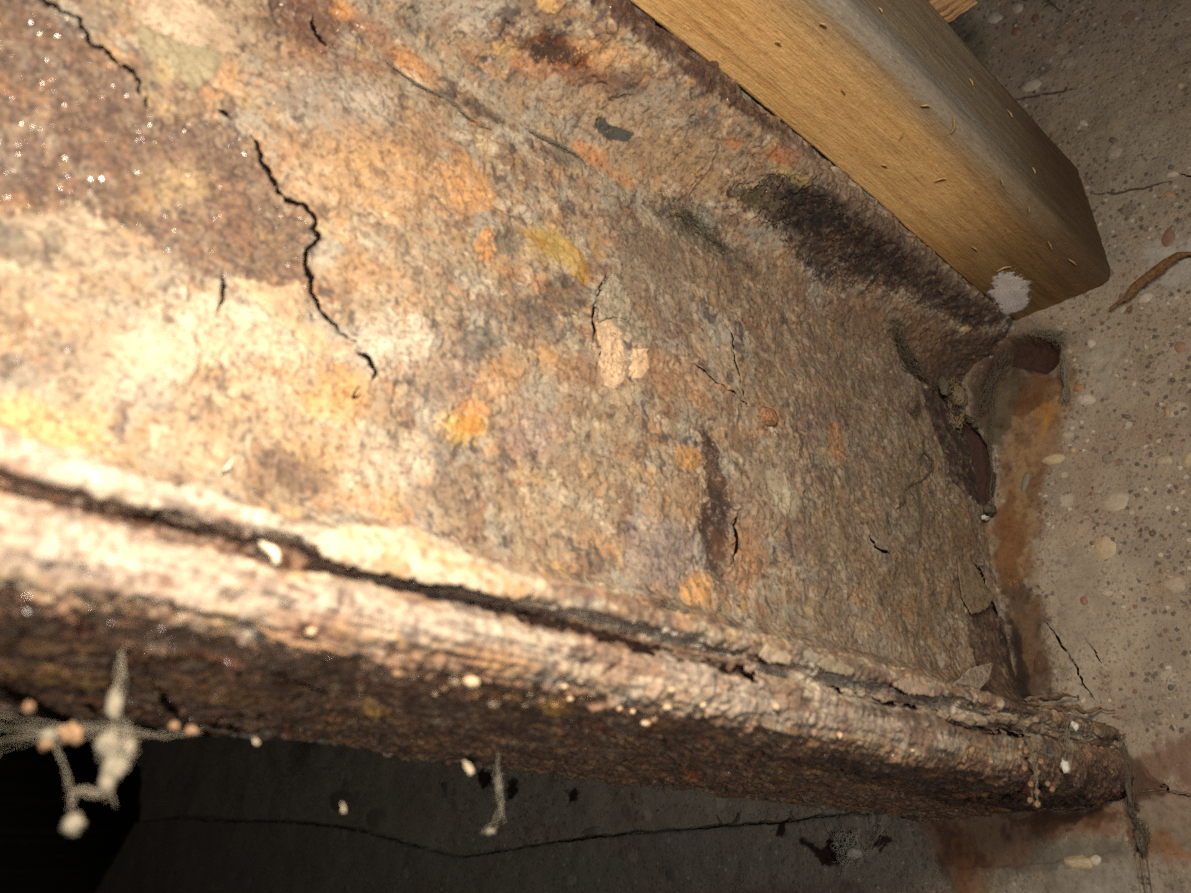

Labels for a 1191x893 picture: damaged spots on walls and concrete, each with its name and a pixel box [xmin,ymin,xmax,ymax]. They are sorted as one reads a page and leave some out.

crack [43,0,148,108]
crack [310,16,328,46]
crack [217,109,377,399]
rust [521,228,632,323]
rust [0,486,758,683]
rust [952,372,1075,705]
rust [758,644,792,665]
rust [816,657,935,709]
rust [938,717,1031,738]
crack [155,815,840,858]
rust [920,758,1164,893]
crack [1146,771,1191,798]